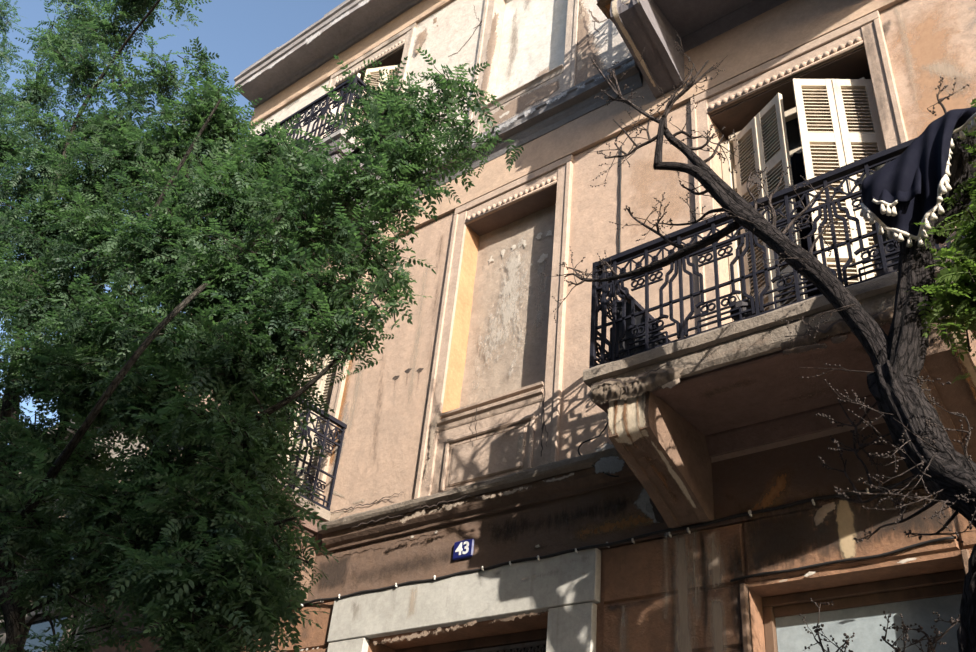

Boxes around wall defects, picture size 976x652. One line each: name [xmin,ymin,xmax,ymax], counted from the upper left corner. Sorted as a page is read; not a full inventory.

flaking render [414,17,438,53]
peeling [575,0,656,87]
peeling [477,230,553,375]
spalling [781,316,851,355]
crack [540,377,548,457]
peeling [595,392,696,508]
flaking render [330,491,404,521]
flaking render [354,485,532,527]
flaking render [814,500,856,558]
water stain [664,527,744,652]